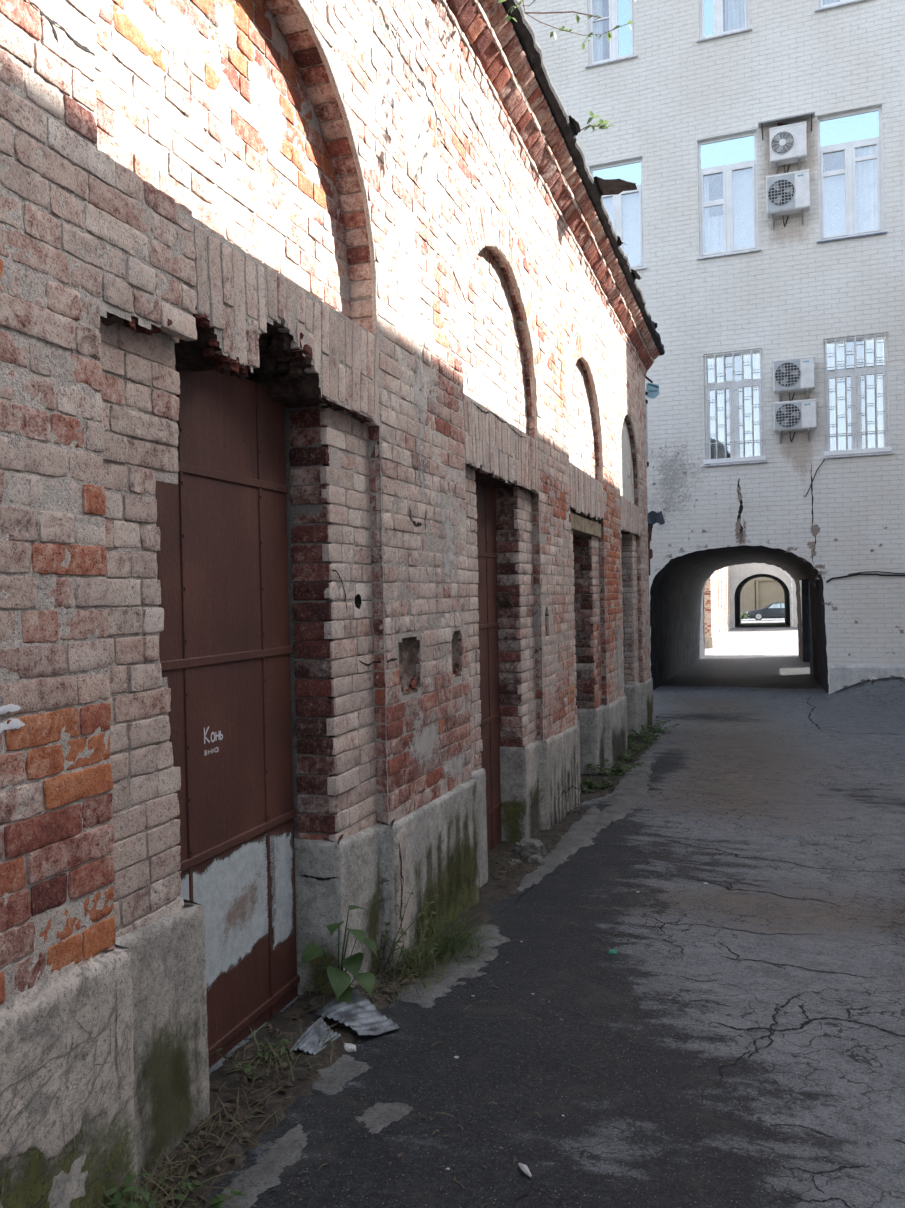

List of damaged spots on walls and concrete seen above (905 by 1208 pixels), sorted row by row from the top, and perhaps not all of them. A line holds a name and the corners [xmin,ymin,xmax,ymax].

peeling [100,313,173,335]
peeling [193,307,312,381]
crack [735,478,747,544]
crack [807,460,821,565]
peeling [177,833,293,989]
crack [666,839,905,906]
crack [645,916,905,1084]
crack [0,984,120,1122]
flaking render [0,948,135,1208]
crack [778,1165,870,1208]